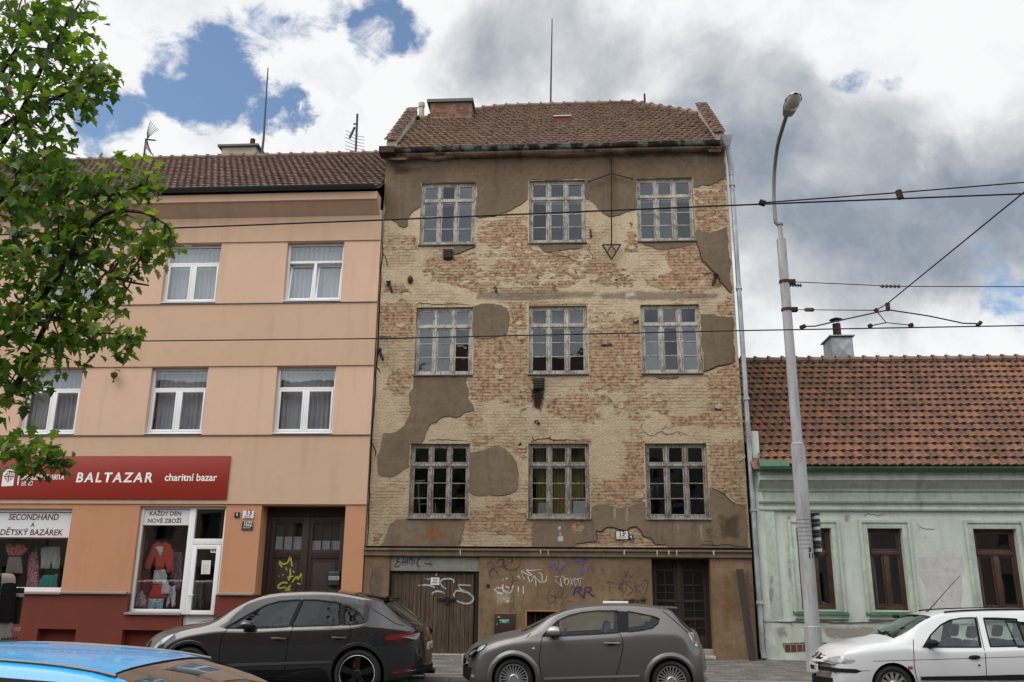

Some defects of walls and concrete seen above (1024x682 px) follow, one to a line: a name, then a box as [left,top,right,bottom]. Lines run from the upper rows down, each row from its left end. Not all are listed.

peeling [373,145,748,549]
crack [584,526,662,545]
spalling [783,642,805,653]